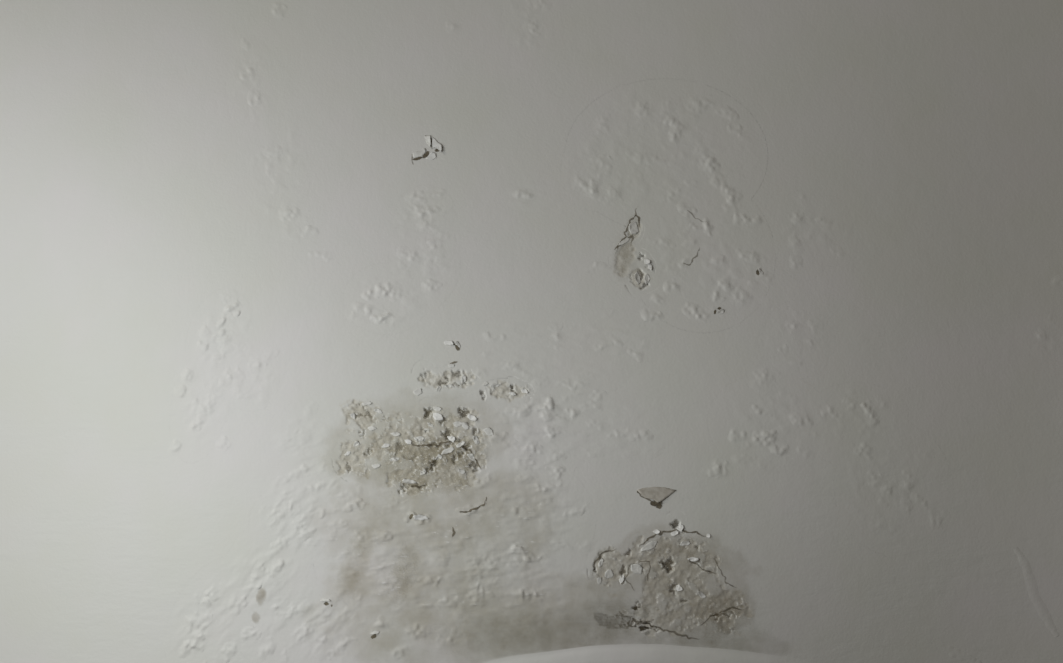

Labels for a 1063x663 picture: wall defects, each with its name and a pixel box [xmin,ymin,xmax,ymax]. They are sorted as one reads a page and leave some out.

peeling [412,135,442,160]
peeling [609,217,660,298]
spalling [329,340,542,504]
spalling [585,487,763,644]